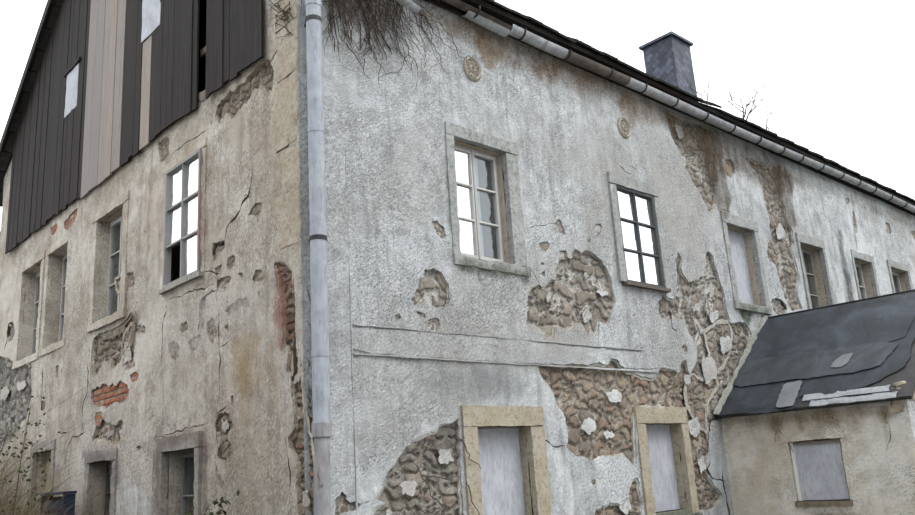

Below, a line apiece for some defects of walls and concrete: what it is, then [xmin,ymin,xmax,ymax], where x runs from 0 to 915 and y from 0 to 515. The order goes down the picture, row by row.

peeling [217,59,274,122]
crack [159,170,253,458]
peeling [214,241,243,290]
peeling [411,269,449,331]
peeling [526,224,614,339]
peeling [745,158,802,315]
peeling [0,356,32,449]
peeling [92,313,145,444]
peeling [217,396,234,488]
peeling [275,262,323,515]
peeling [334,420,462,515]
peeling [538,252,751,515]